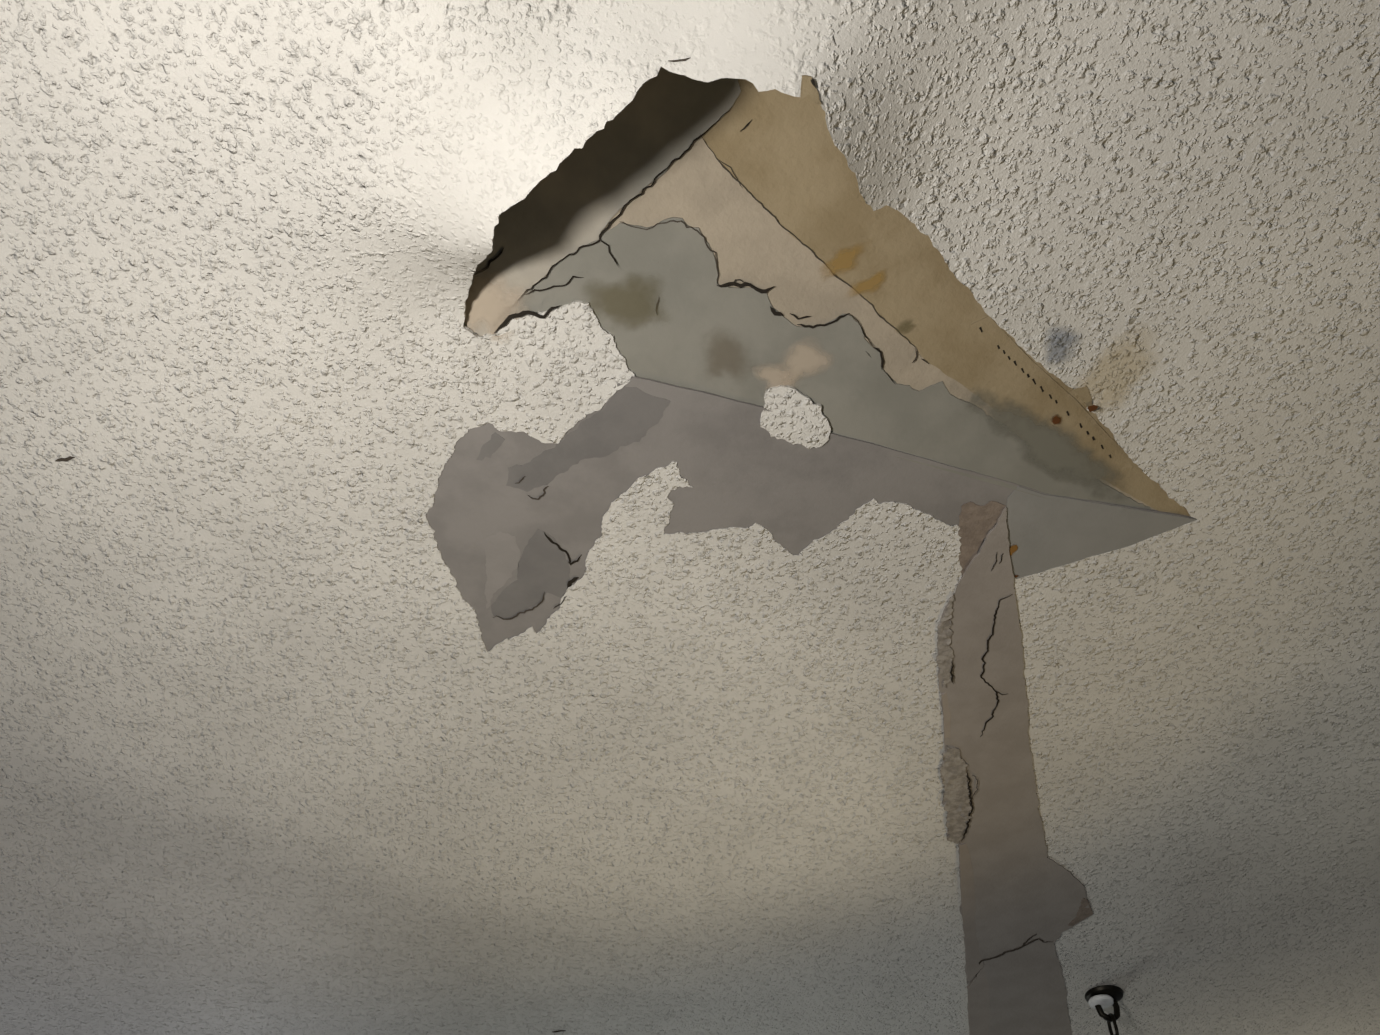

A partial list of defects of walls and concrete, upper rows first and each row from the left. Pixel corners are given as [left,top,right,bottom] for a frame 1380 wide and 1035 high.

crack [515,476,548,500]
crack [493,532,582,620]
crack [950,554,1012,737]
peeling [426,376,1197,1035]
crack [961,770,978,842]
crack [975,934,1053,979]